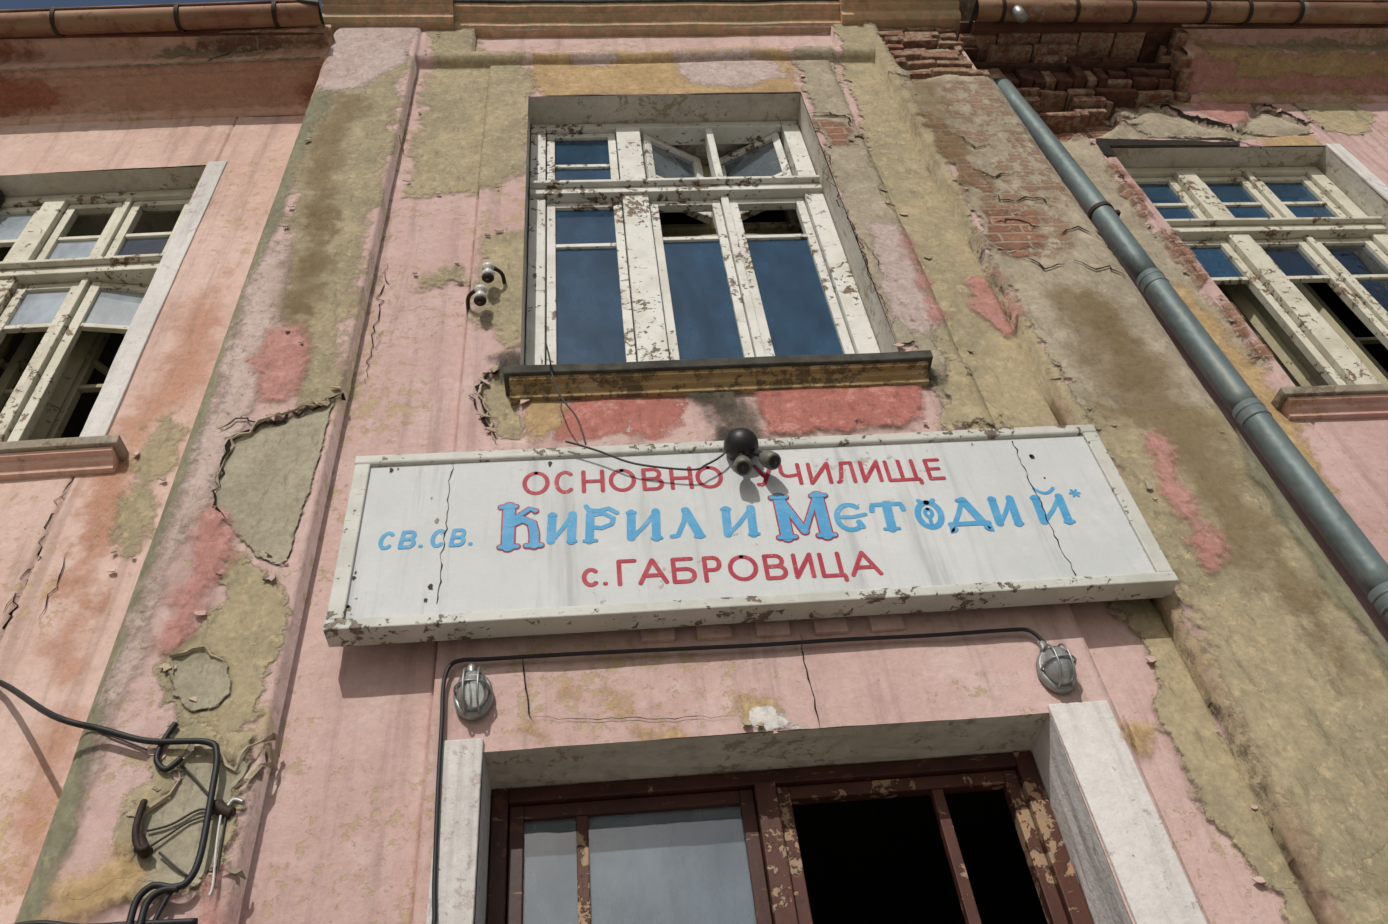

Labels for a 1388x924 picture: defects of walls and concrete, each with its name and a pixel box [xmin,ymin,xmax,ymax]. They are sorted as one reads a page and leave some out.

peeling [99,26,421,809]
crack [211,264,389,517]
peeling [402,21,1388,924]
damp [1239,432,1388,667]
flaking render [183,814,246,924]